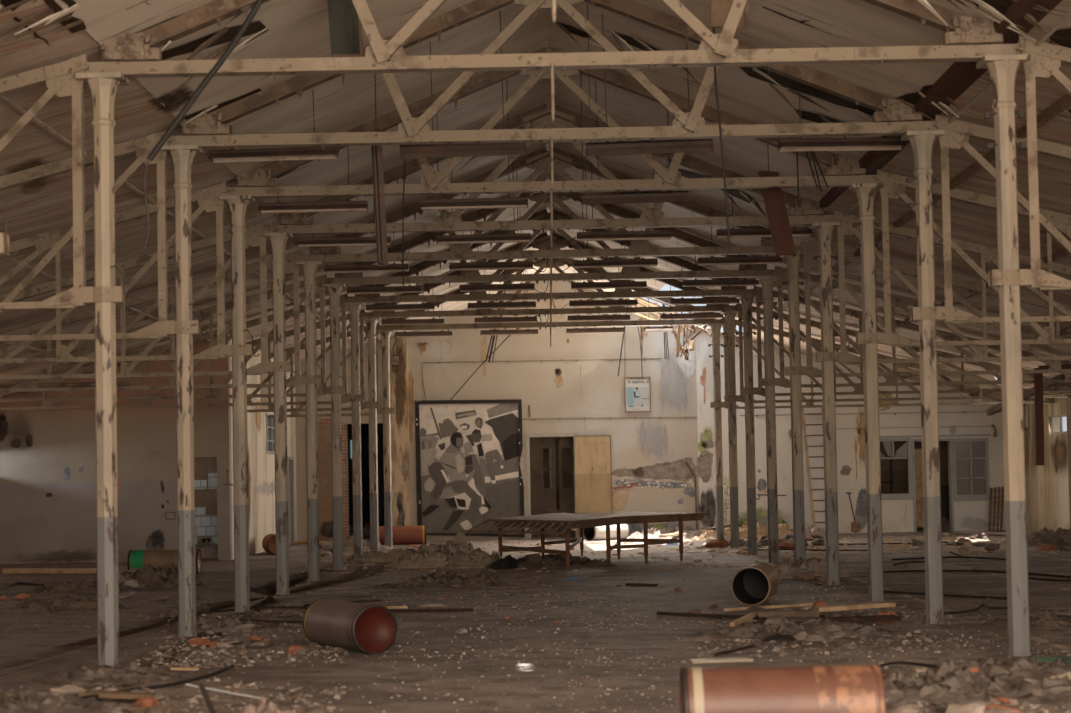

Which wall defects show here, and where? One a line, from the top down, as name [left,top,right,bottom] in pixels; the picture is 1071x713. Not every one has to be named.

flaking render [612,441,714,511]